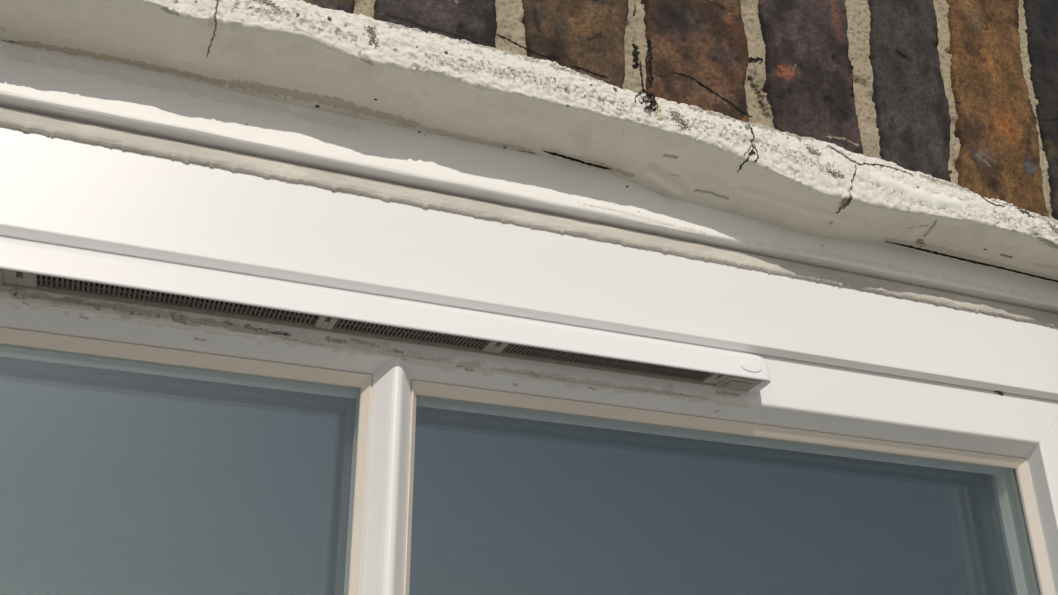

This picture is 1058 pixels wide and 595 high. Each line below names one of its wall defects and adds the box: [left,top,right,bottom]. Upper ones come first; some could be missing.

crack [207,0,219,58]
crack [748,56,763,64]
crack [647,38,759,173]
crack [544,151,612,170]
crack [826,145,912,225]